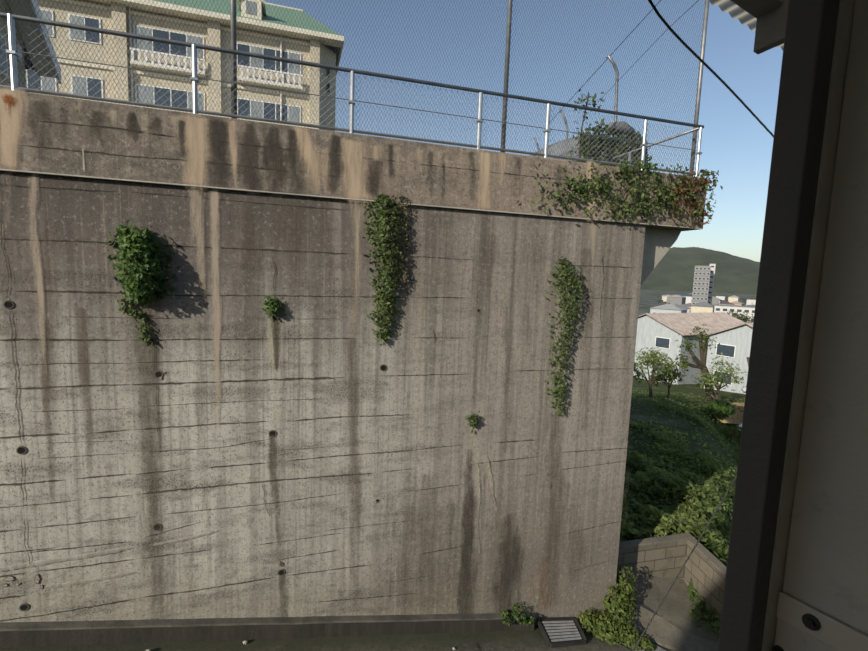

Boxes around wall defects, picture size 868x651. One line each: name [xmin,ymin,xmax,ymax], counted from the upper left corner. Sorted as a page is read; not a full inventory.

damp [0,88,24,168]
crack [0,220,30,565]
damp [30,174,49,419]
damp [173,116,221,406]
damp [228,120,237,179]